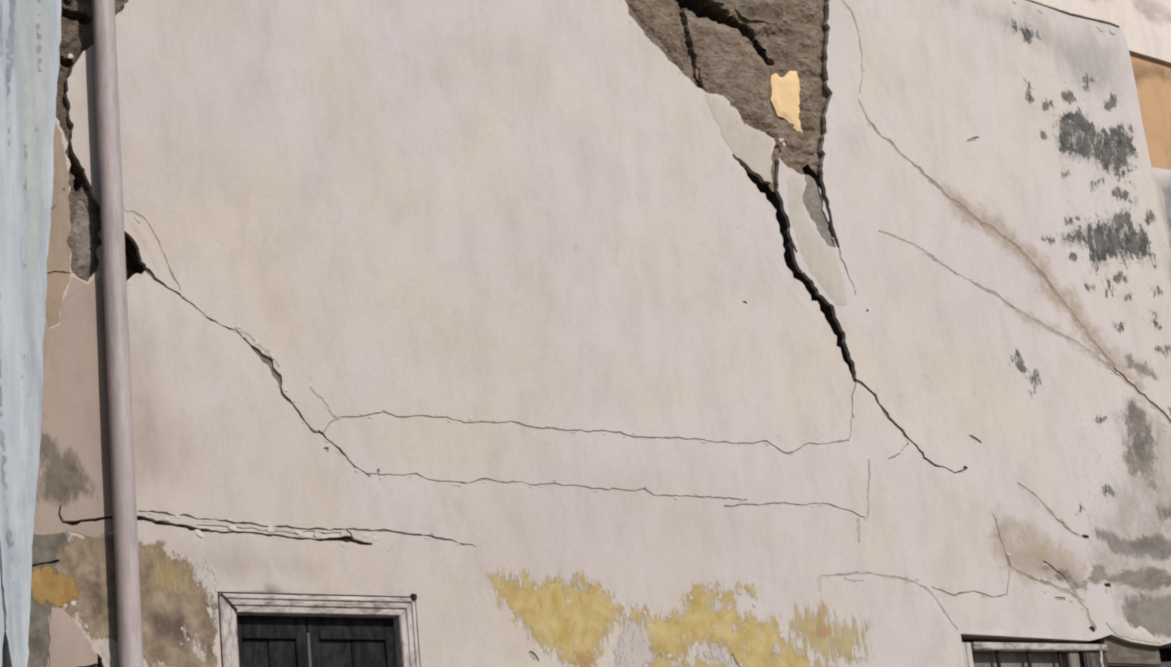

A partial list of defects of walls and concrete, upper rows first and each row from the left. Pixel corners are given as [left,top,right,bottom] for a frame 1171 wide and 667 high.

damp [1012,20,1040,44]
spalling [56,0,102,281]
spalling [619,0,834,247]
crack [842,0,1171,431]
damp [1026,74,1156,300]
crack [145,138,1096,630]
damp [1120,402,1158,492]
flaking render [27,532,119,667]
flaking render [138,541,218,667]
crack [62,511,470,547]
peeling [488,570,868,667]
damp [1089,522,1171,637]